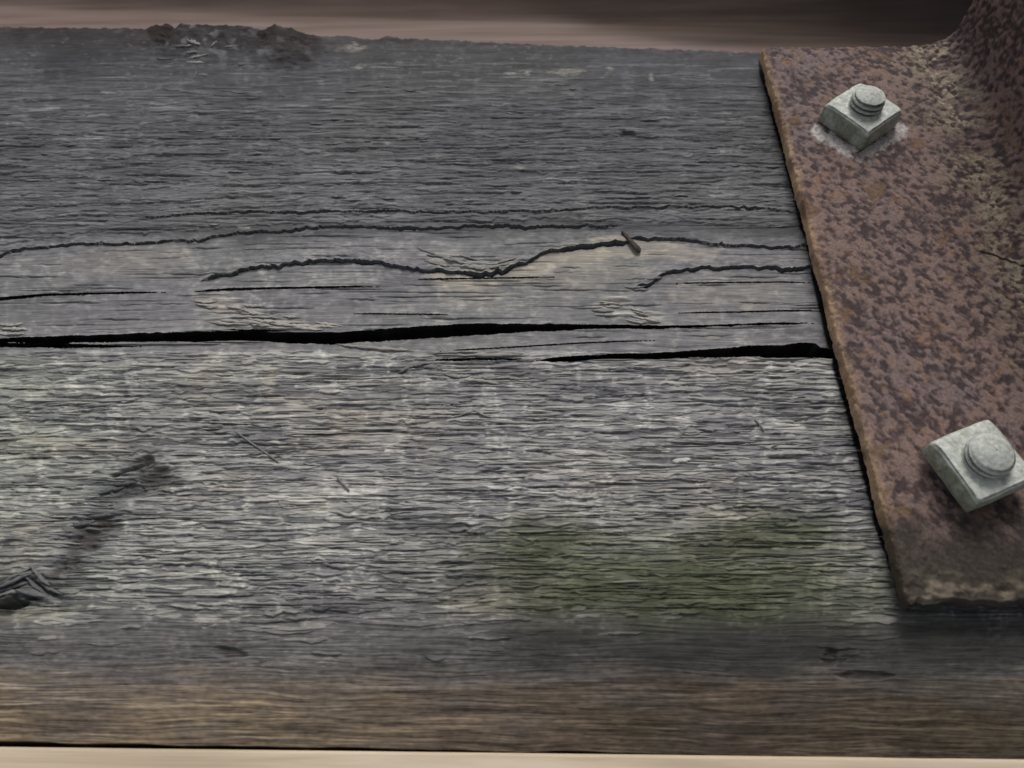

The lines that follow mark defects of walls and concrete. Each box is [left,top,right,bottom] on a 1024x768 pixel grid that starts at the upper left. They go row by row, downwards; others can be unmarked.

corrosion [811,124,907,162]
crack [0,204,813,292]
crack [0,291,166,301]
crack [0,309,836,363]
corrosion [759,61,891,572]